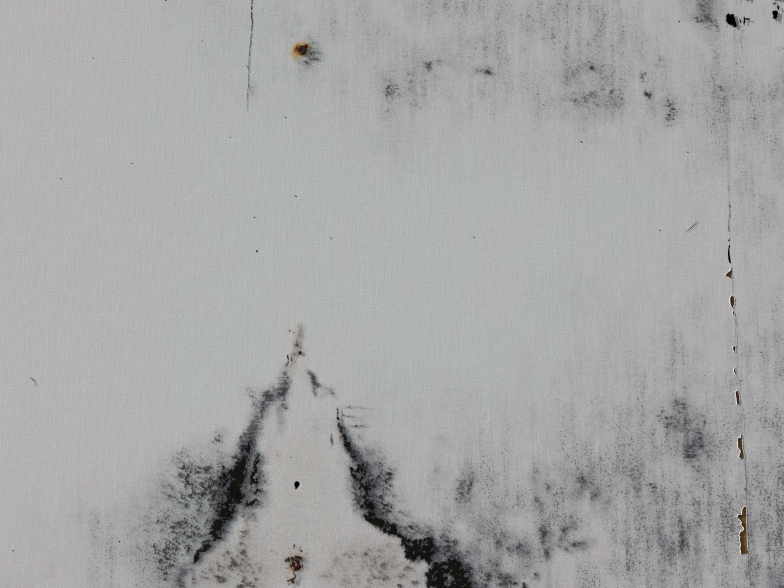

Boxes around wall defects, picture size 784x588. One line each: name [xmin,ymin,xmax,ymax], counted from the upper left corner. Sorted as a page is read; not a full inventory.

peeling [726,13,750,27]
crack [246,0,254,98]
rust [292,43,309,59]
leakage [307,371,333,396]
spalling [737,435,745,459]
leakage [140,371,291,588]
leakage [330,406,530,588]
leakage [571,473,609,504]
leakage [539,515,585,561]
spalling [737,506,750,555]
rust [285,544,303,585]